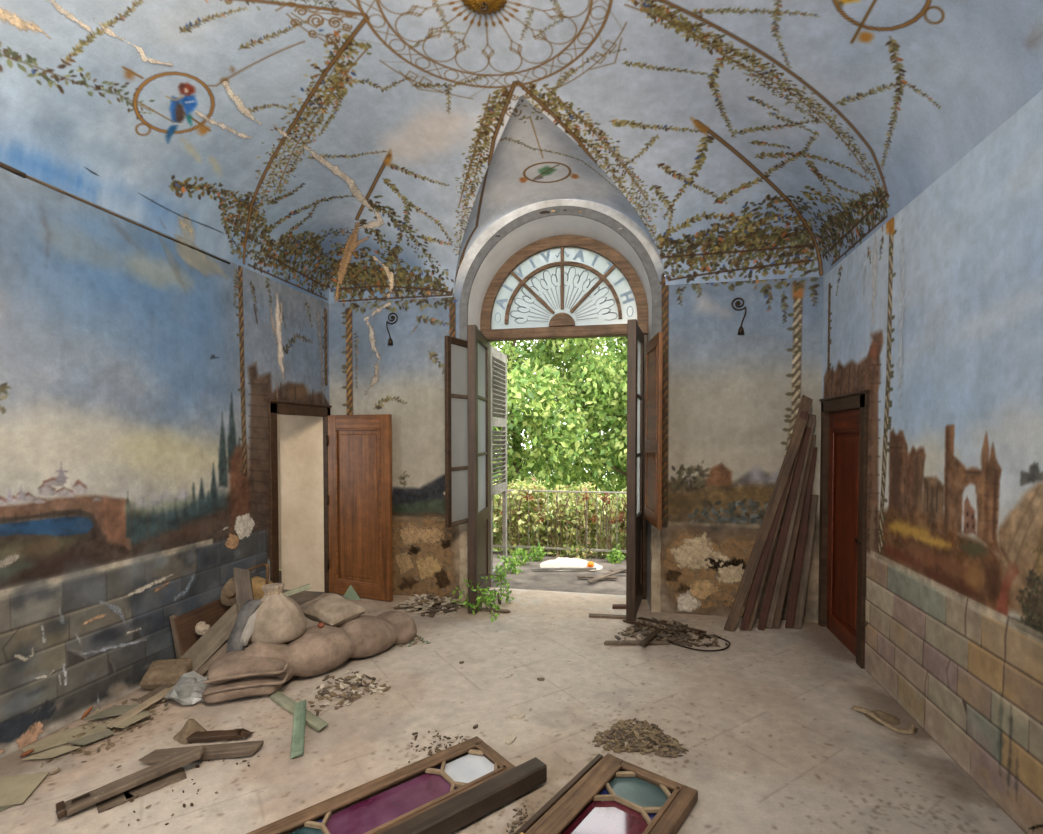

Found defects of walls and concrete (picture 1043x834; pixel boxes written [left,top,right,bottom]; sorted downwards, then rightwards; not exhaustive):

peeling [0,8,51,39]
peeling [334,222,369,302]
peeling [0,554,19,567]
spalling [223,513,255,549]
spalling [392,516,456,597]
spalling [661,532,756,618]